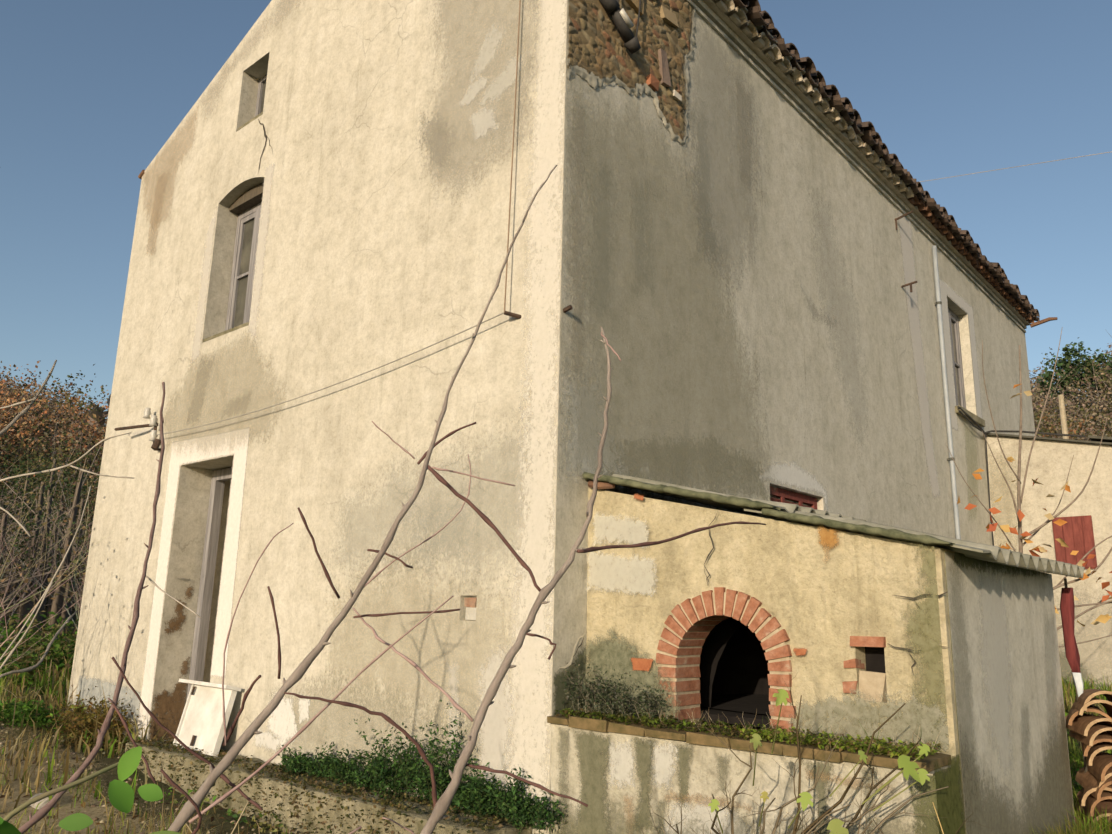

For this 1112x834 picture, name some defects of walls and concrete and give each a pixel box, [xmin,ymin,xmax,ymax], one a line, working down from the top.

damp [459,26,523,138]
flaking render [567,0,696,145]
crack [258,119,272,172]
crack [704,511,718,585]
flaking render [165,585,194,634]
damp [559,731,751,834]
damp [807,762,833,834]
damp [961,709,1075,834]